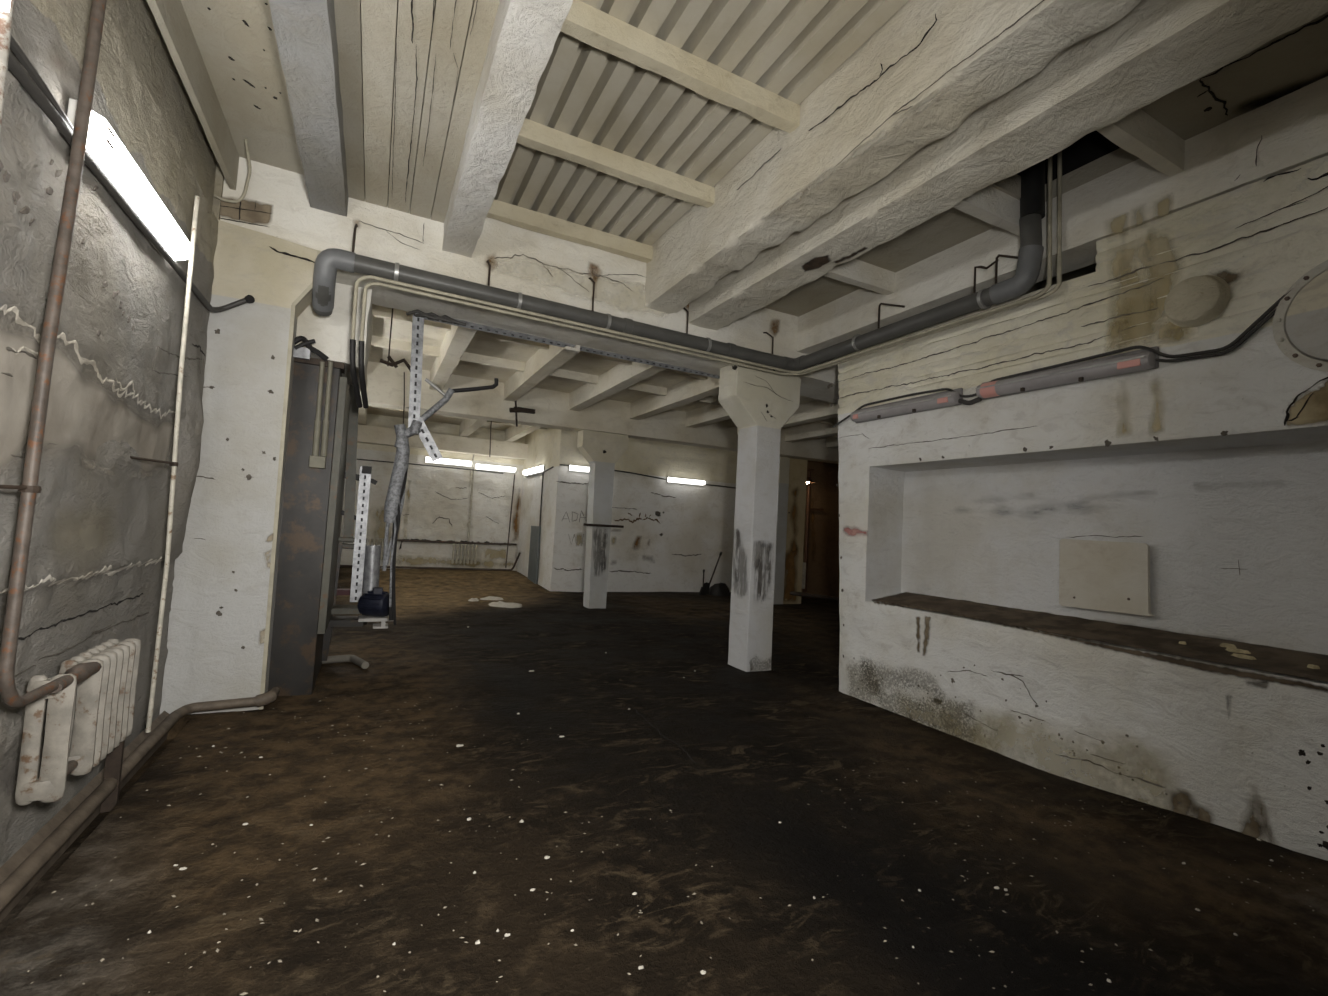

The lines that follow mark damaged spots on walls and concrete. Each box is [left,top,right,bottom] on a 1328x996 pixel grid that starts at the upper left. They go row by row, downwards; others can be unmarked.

crack [1197,15,1328,116]
crack [361,0,478,249]
flaking render [0,160,35,226]
flaking render [46,159,63,195]
crack [491,254,643,291]
crack [834,135,1328,399]
leakage [1111,237,1184,346]
flaking render [0,304,175,473]
flaking render [1284,377,1328,426]